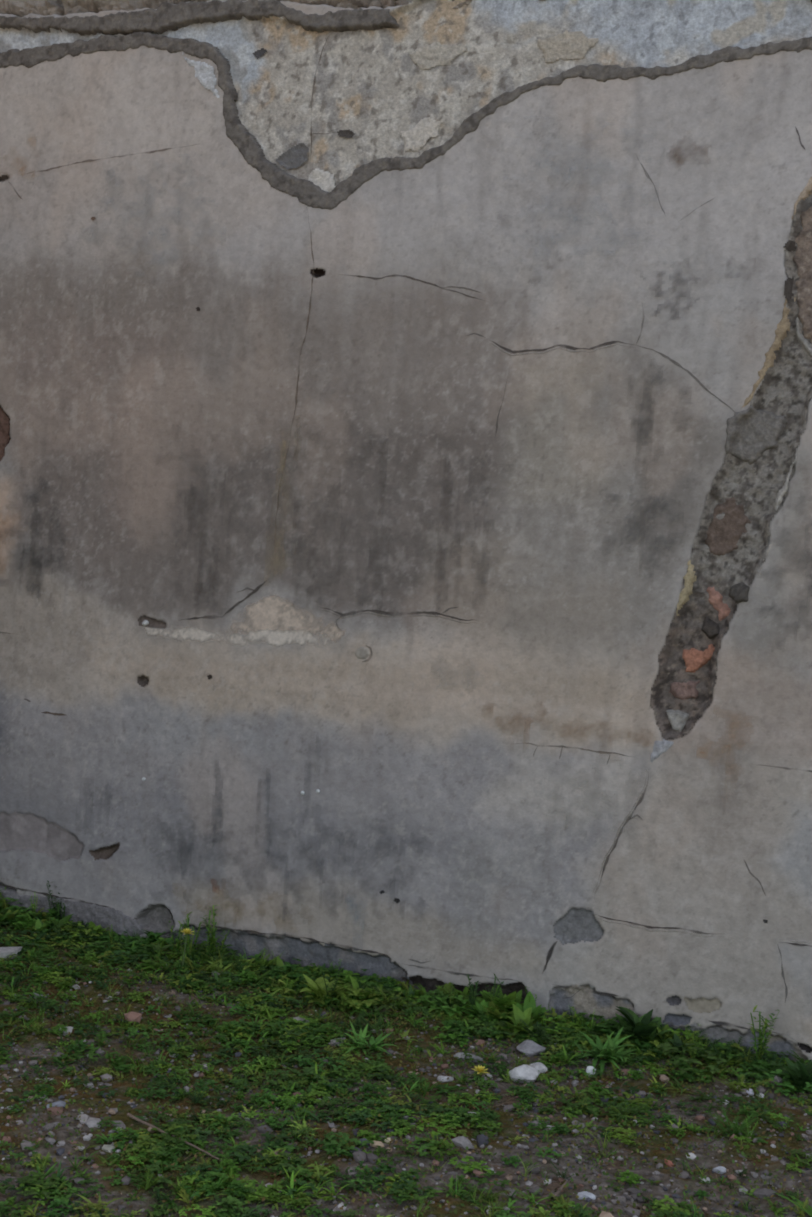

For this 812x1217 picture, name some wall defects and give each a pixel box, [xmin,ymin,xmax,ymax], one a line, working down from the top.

peeling [0,27,130,53]
peeling [152,0,812,192]
crack [357,275,481,299]
crack [470,333,729,407]
spalling [650,177,812,762]
peeling [145,596,344,646]
crack [324,607,473,630]
crack [601,793,644,875]
peeling [164,923,419,990]
crack [595,914,711,934]
crack [777,940,809,1001]
peeling [546,984,807,1064]